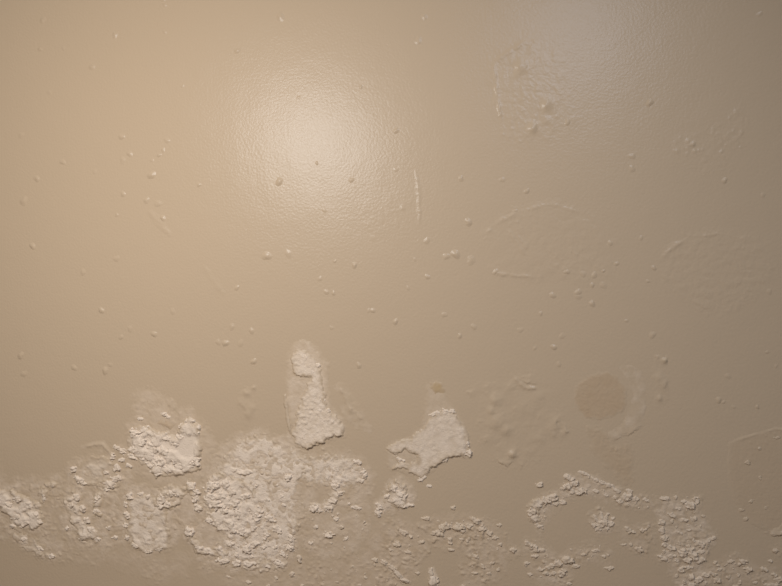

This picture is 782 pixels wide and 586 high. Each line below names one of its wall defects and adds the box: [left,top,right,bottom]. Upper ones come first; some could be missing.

peeling [283,339,349,450]
water stain [0,385,782,586]
peeling [384,379,473,488]